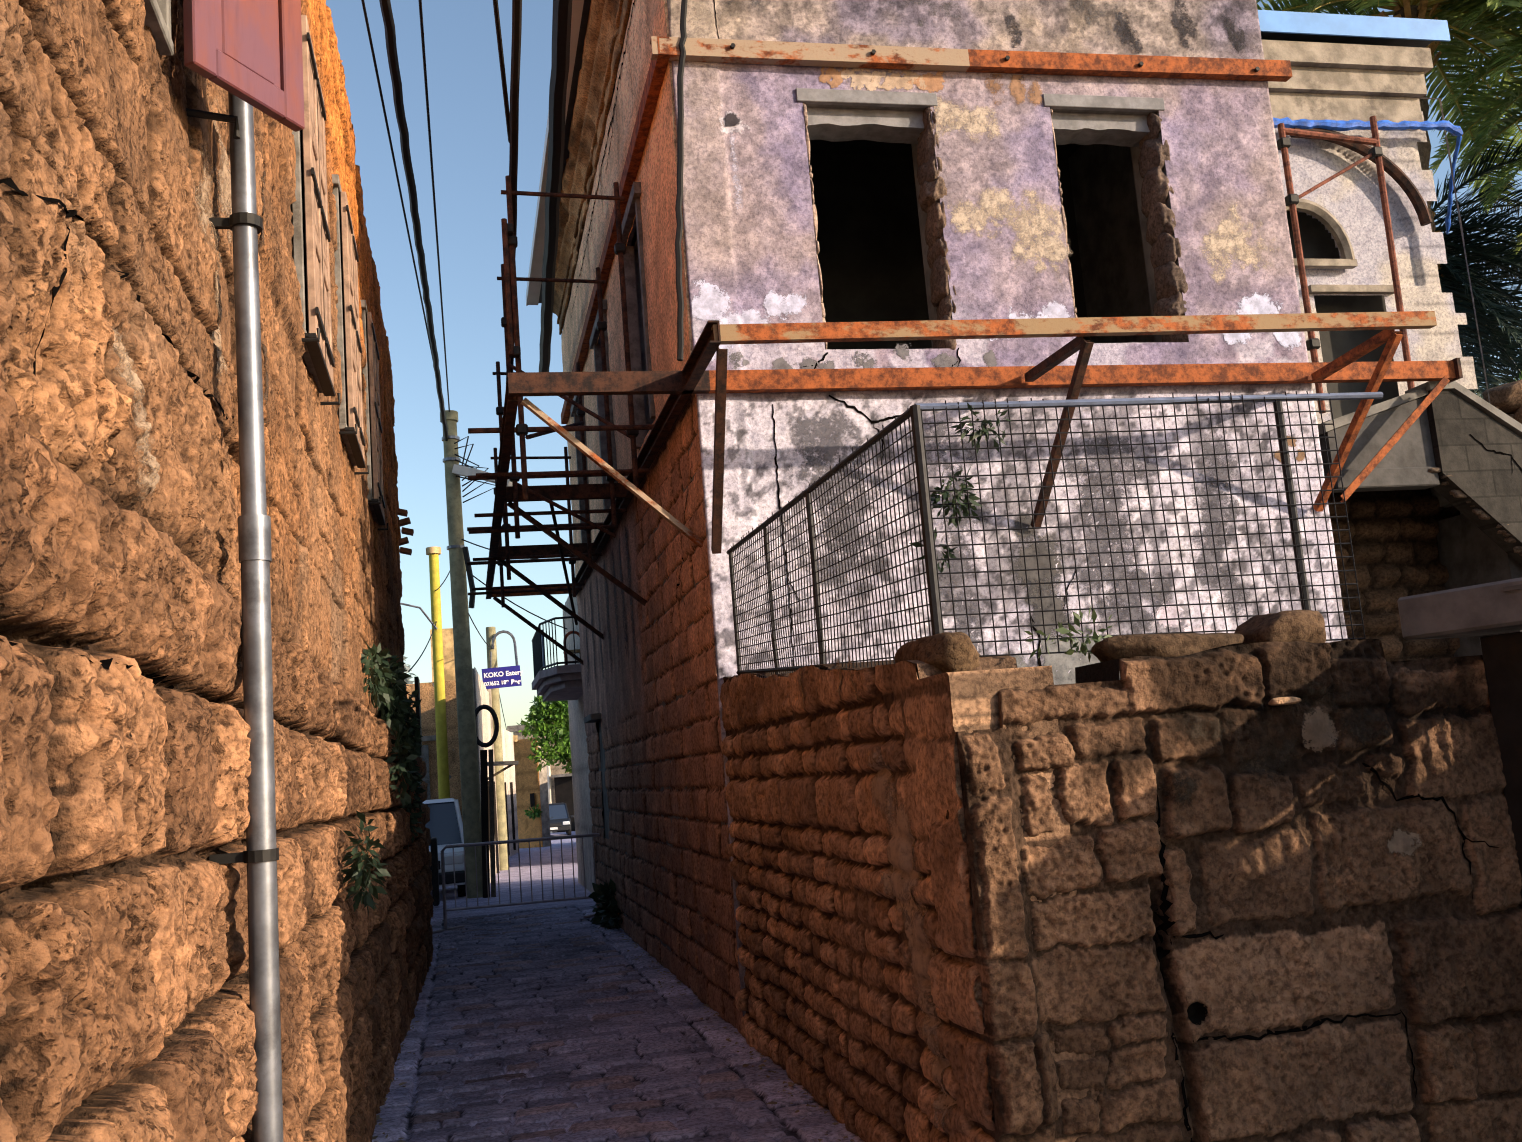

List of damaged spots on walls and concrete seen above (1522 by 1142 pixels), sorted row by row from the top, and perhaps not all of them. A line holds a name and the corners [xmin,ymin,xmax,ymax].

corrosion [819,67,952,93]
peeling [691,103,826,324]
spalling [917,97,1078,320]
crack [0,178,84,376]
crack [115,270,234,423]
peeling [711,344,755,369]
peeling [772,342,835,369]
crack [800,352,899,458]
peeling [852,351,877,368]
peeling [894,339,964,367]
crack [1470,434,1522,473]
crack [1362,763,1500,899]